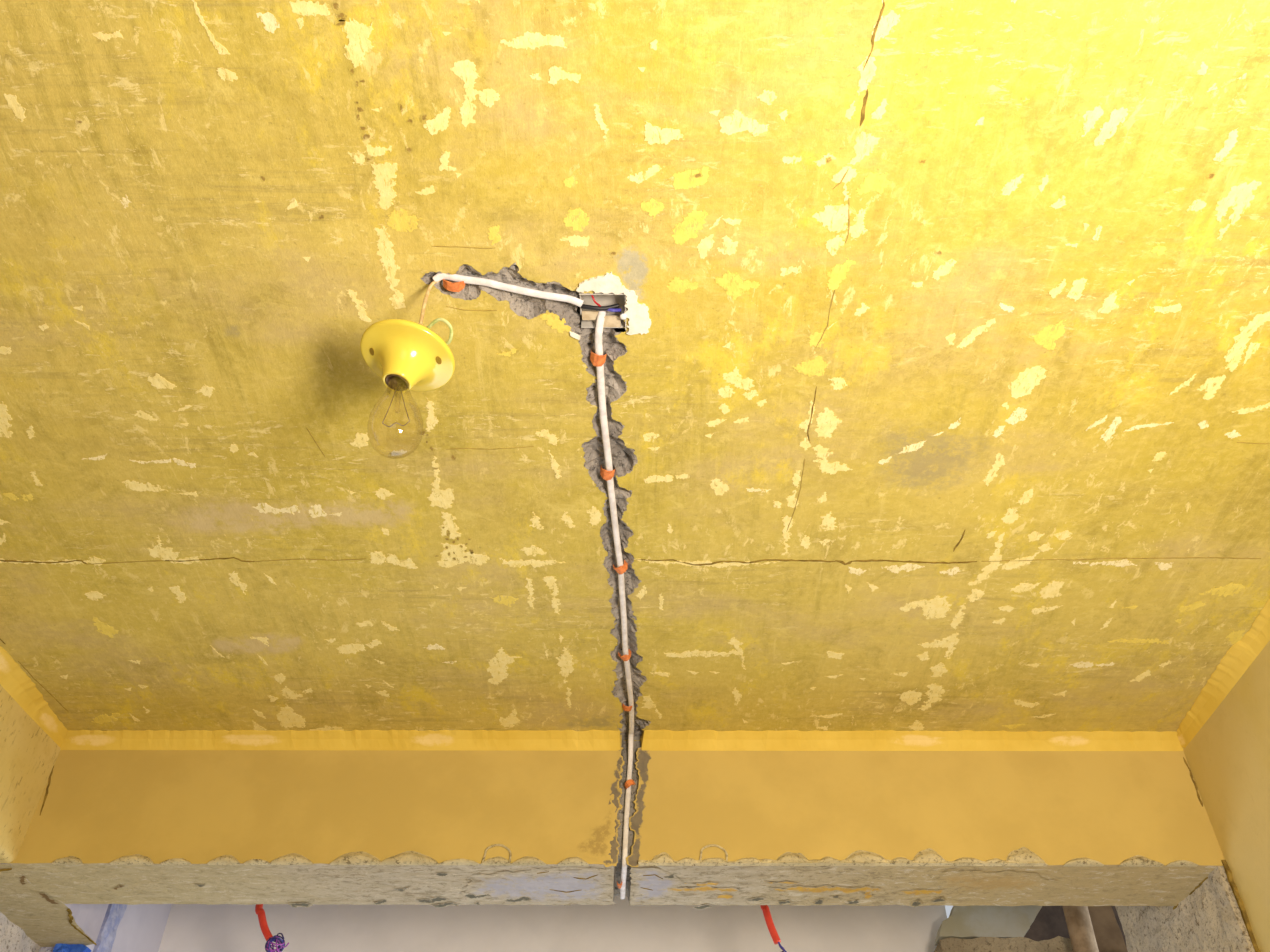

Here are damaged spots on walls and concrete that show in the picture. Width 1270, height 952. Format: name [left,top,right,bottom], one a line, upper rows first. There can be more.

peeling [191,0,238,82]
peeling [256,12,280,33]
peeling [342,18,374,68]
peeling [423,60,500,135]
peeling [709,89,788,136]
crack [860,0,885,126]
crack [833,169,850,243]
crack [816,289,836,347]
peeling [1170,311,1270,400]
peeling [992,365,1047,438]
peeling [892,489,1072,731]
flaking render [638,844,1048,866]